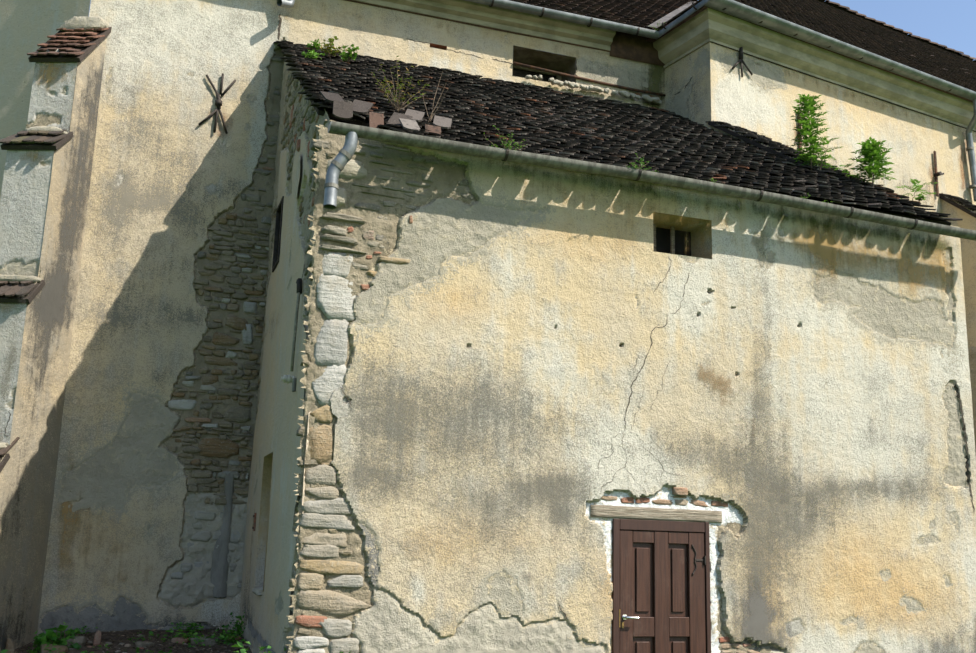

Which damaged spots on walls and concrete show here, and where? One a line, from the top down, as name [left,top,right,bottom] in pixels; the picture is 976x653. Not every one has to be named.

spalling [255,56,607,653]
damp [340,352,597,556]
crack [598,258,689,492]
damp [660,249,943,651]
peeling [810,249,957,357]
peeling [916,520,939,545]
flaking render [942,346,976,488]